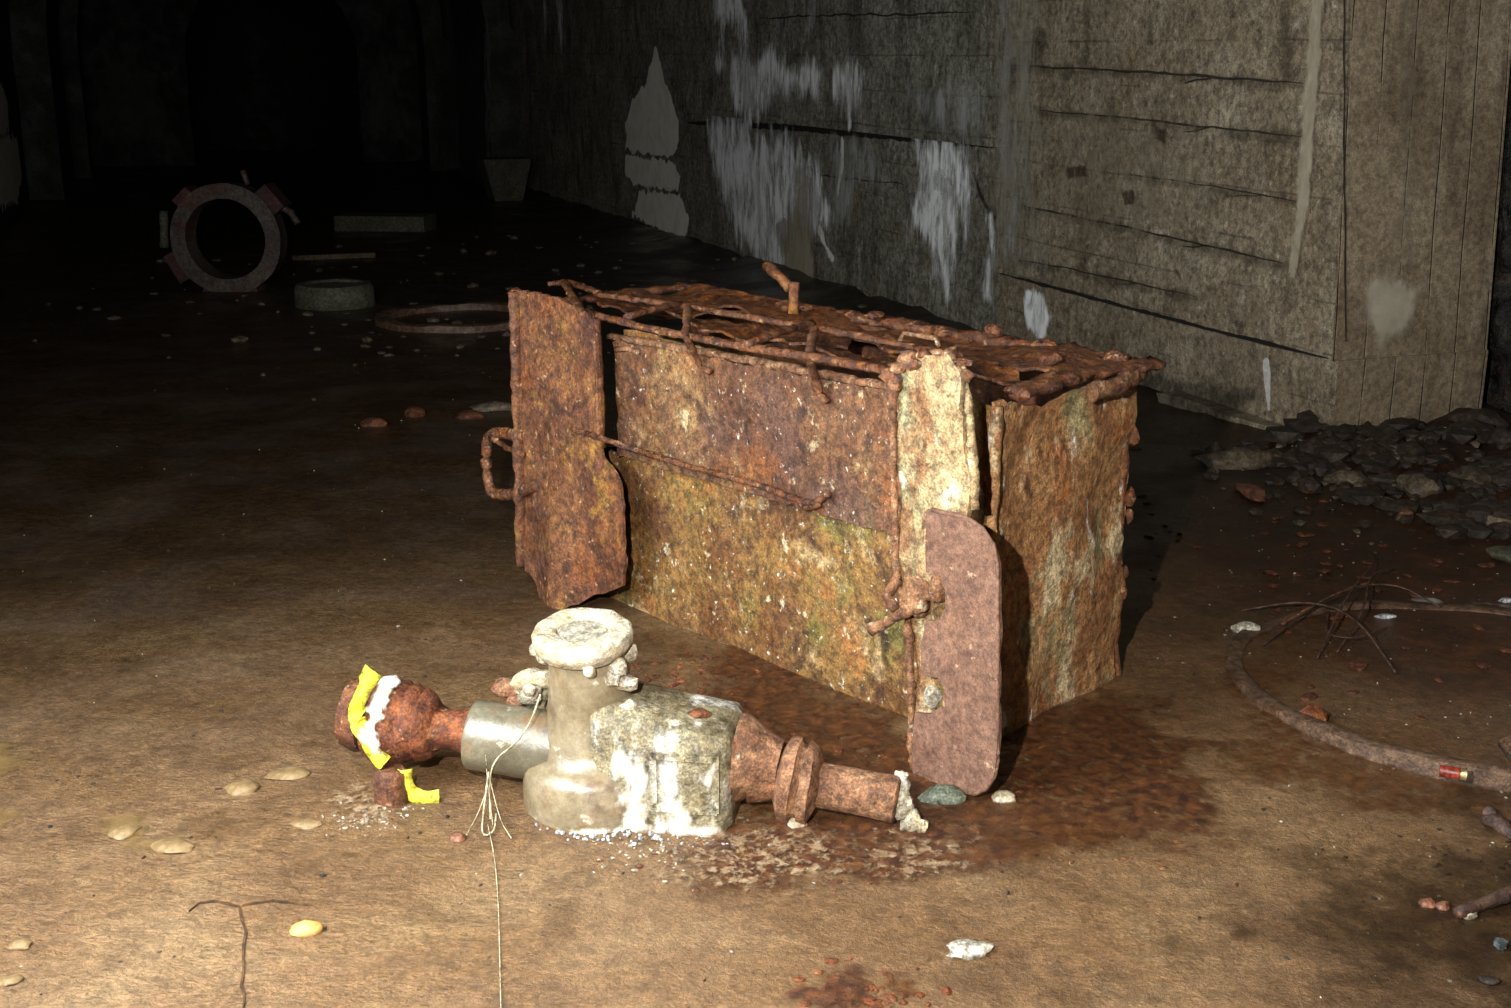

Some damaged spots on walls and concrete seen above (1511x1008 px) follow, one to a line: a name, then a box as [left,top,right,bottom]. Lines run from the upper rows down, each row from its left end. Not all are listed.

spalling [625,46,689,236]
damp [707,0,875,264]
damp [912,84,979,301]
damp [984,0,1036,299]
corrosion [784,957,952,1008]